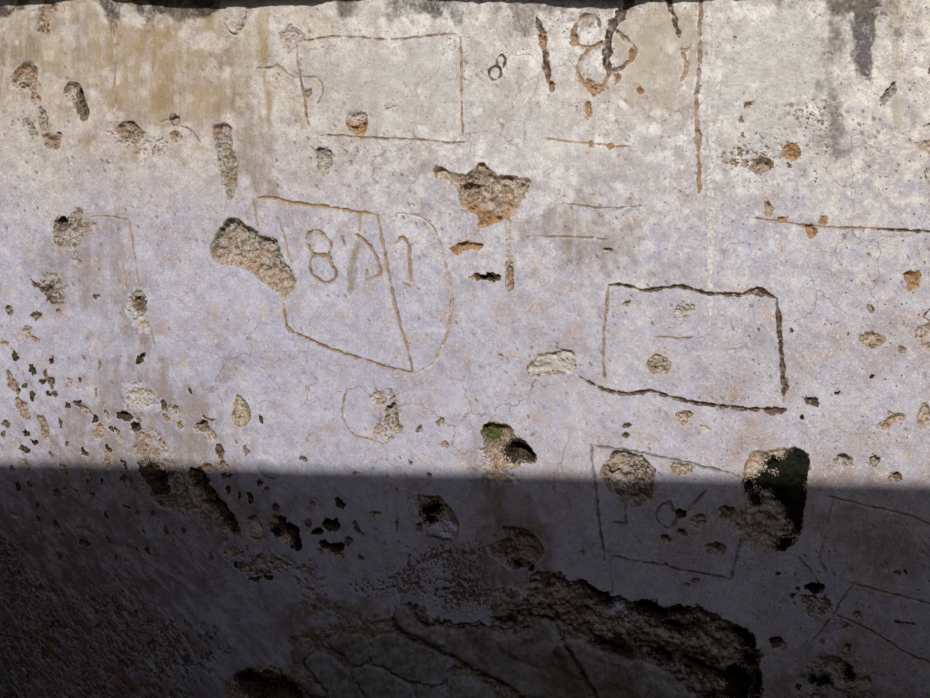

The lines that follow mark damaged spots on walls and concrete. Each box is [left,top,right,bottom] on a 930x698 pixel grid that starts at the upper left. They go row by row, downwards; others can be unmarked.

leakage [827,0,880,79]
leakage [705,0,818,334]
spalling [425,158,538,297]
spalling [898,264,929,297]
spalling [840,299,930,366]
spalling [794,384,846,426]
spalling [863,370,880,384]
spalling [0,202,793,698]
spalling [828,447,908,489]
spalling [654,441,846,630]
spalling [792,638,879,697]